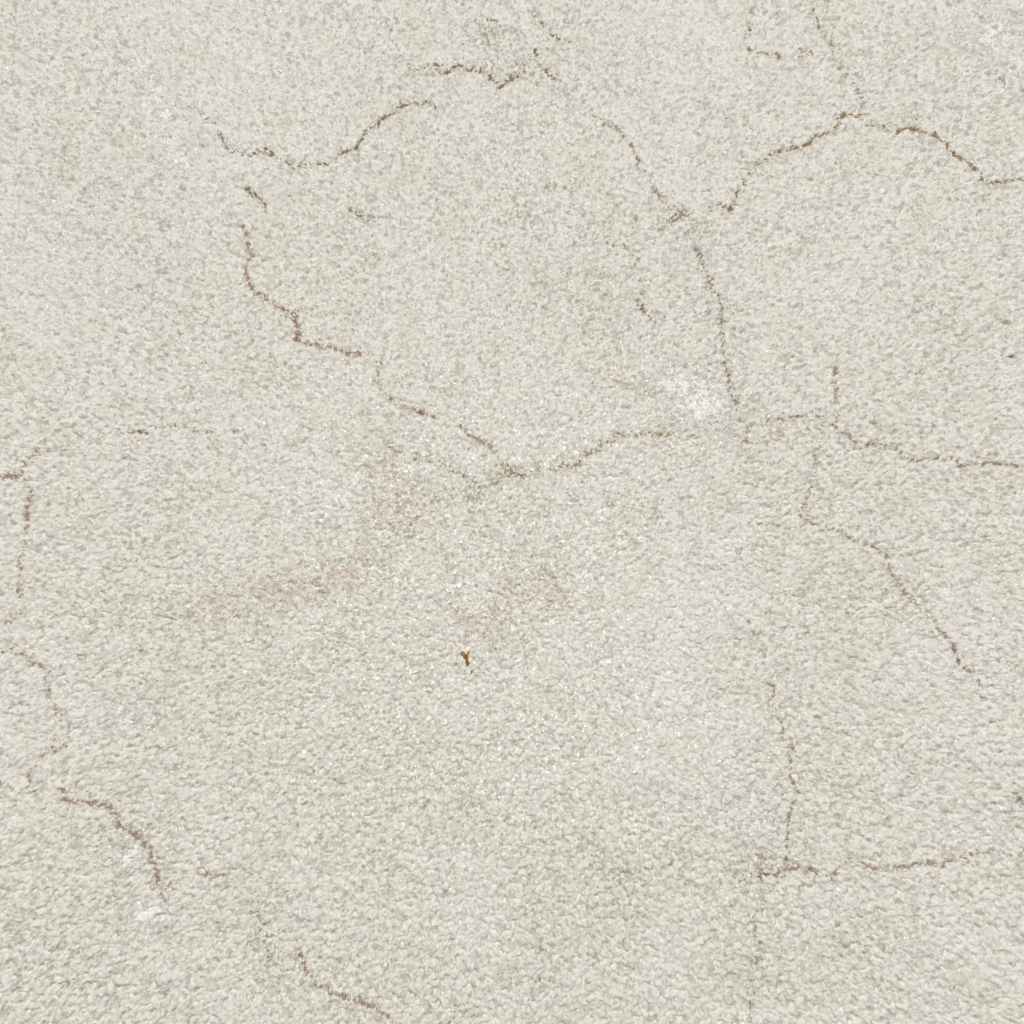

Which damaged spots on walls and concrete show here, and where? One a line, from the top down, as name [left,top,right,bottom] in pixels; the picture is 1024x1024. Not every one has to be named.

crack [203,100,436,167]
crack [417,16,569,90]
crack [717,6,1022,214]
crack [0,447,49,624]
crack [241,225,435,419]
rust [411,550,579,686]
crack [461,424,674,475]
crack [695,240,1019,488]
crack [799,455,993,723]
crack [0,648,171,902]
crack [732,722,1022,1023]
crack [298,948,389,1018]